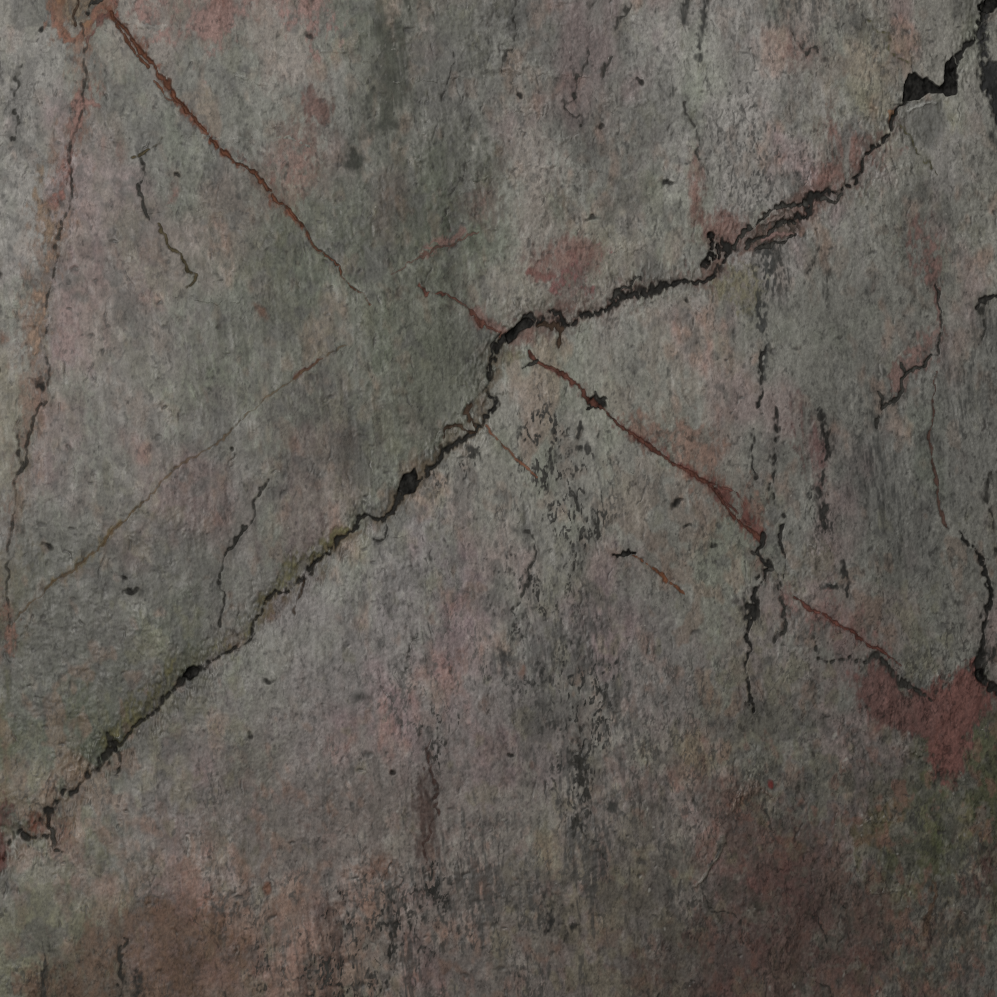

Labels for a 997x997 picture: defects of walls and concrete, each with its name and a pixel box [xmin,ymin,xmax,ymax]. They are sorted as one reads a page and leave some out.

crack [11,76,20,140]
crack [45,144,73,333]
corrosion [44,0,247,66]
crack [72,0,370,305]
crack [292,0,997,614]
crack [13,358,50,484]
crack [217,479,269,627]
crack [522,350,932,713]
crack [875,284,997,696]
crack [8,589,289,852]
crack [572,726,608,867]
corrosion [846,657,996,787]